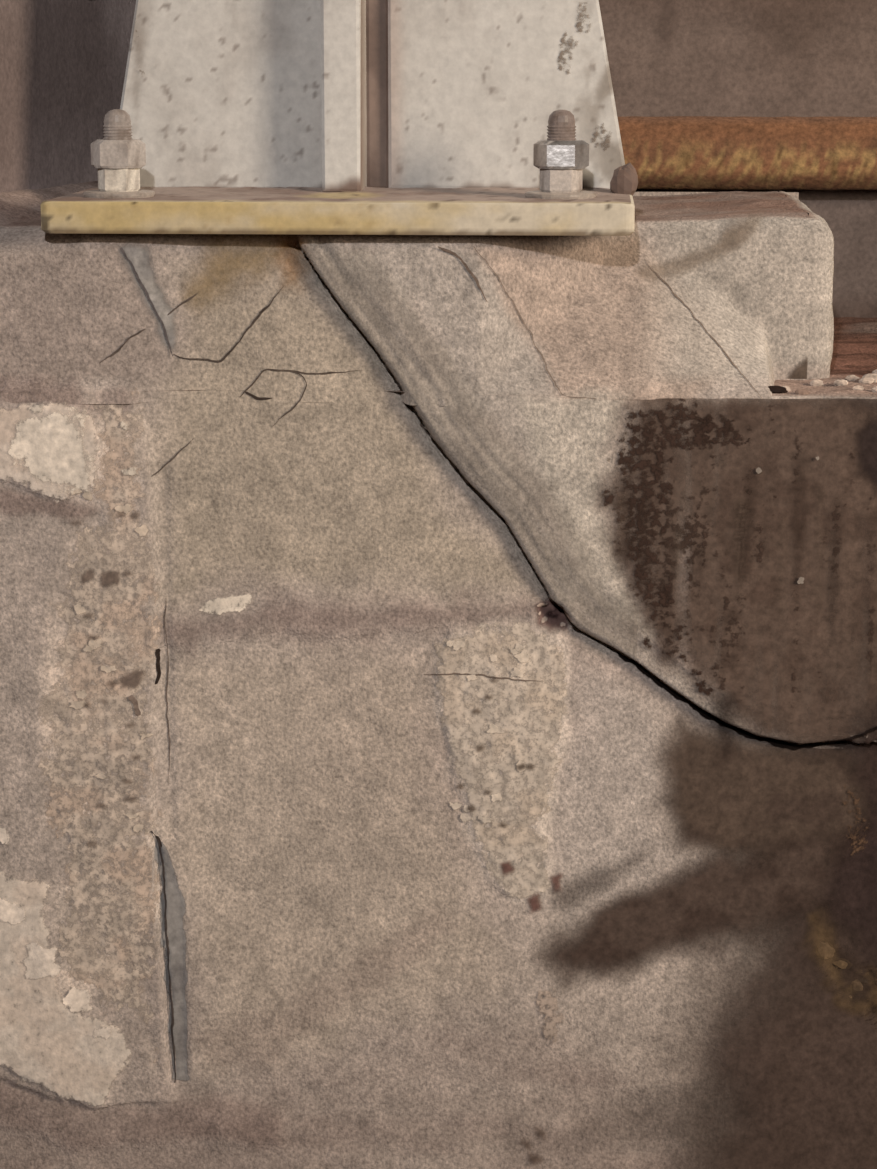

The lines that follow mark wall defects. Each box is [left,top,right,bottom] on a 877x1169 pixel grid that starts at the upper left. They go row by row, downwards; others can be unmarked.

spalling [0,391,163,1106]
crack [155,604,170,777]
crack [151,438,194,477]
crack [101,246,283,363]
crack [240,246,877,750]
leakage [548,398,877,1169]